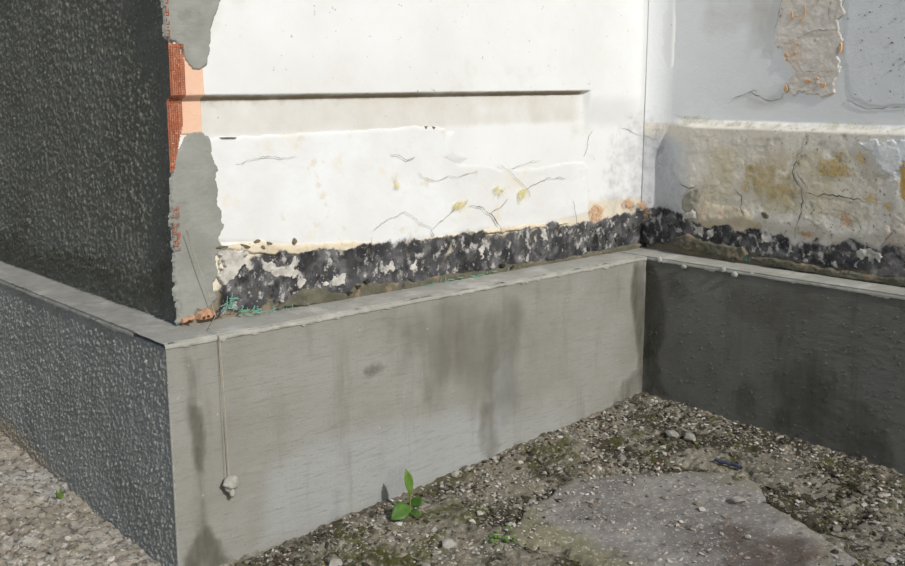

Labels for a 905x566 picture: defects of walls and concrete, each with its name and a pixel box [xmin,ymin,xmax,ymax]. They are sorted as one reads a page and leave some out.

crack [370,200,507,255]
spalling [669,188,905,287]
crack [792,155,860,230]
peeling [858,139,905,182]
spalling [180,307,217,323]
water stain [634,260,905,475]